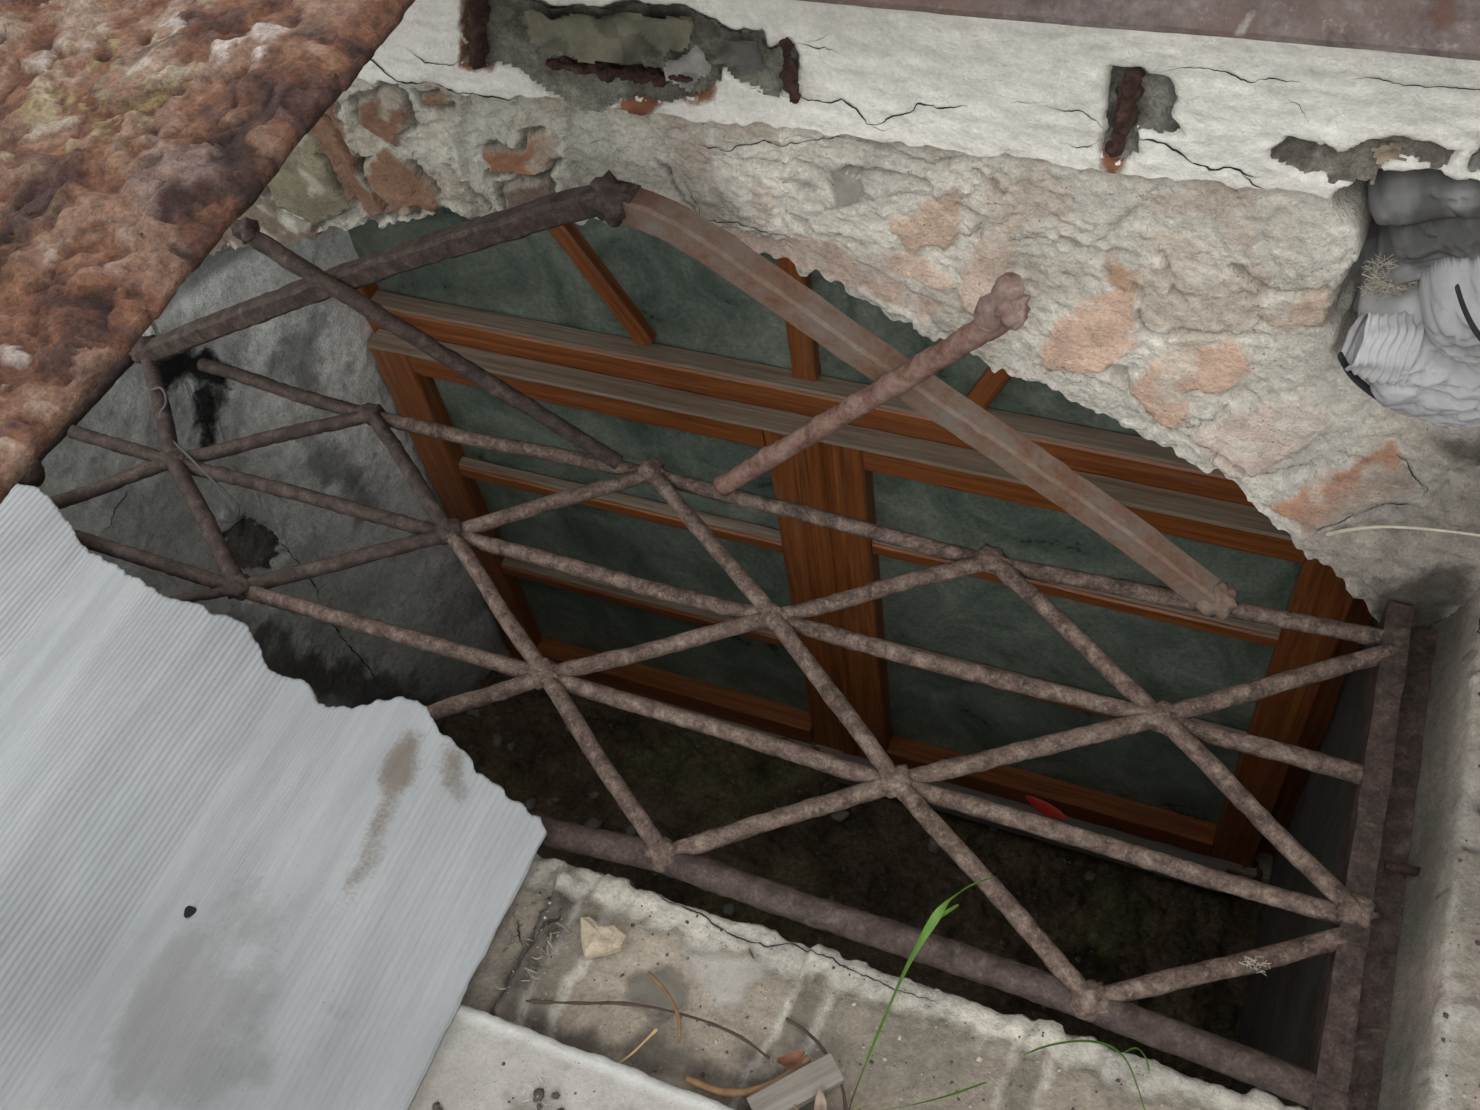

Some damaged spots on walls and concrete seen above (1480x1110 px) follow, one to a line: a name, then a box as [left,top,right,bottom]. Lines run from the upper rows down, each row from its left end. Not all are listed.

crack [370,45,553,101]
corrosion [458,0,495,71]
spalling [462,0,801,114]
crack [697,88,960,152]
crack [1014,101,1105,148]
corrosion [1101,146,1125,173]
crack [1140,139,1267,190]
spalling [1270,135,1455,185]
spalling [1468,151,1480,173]